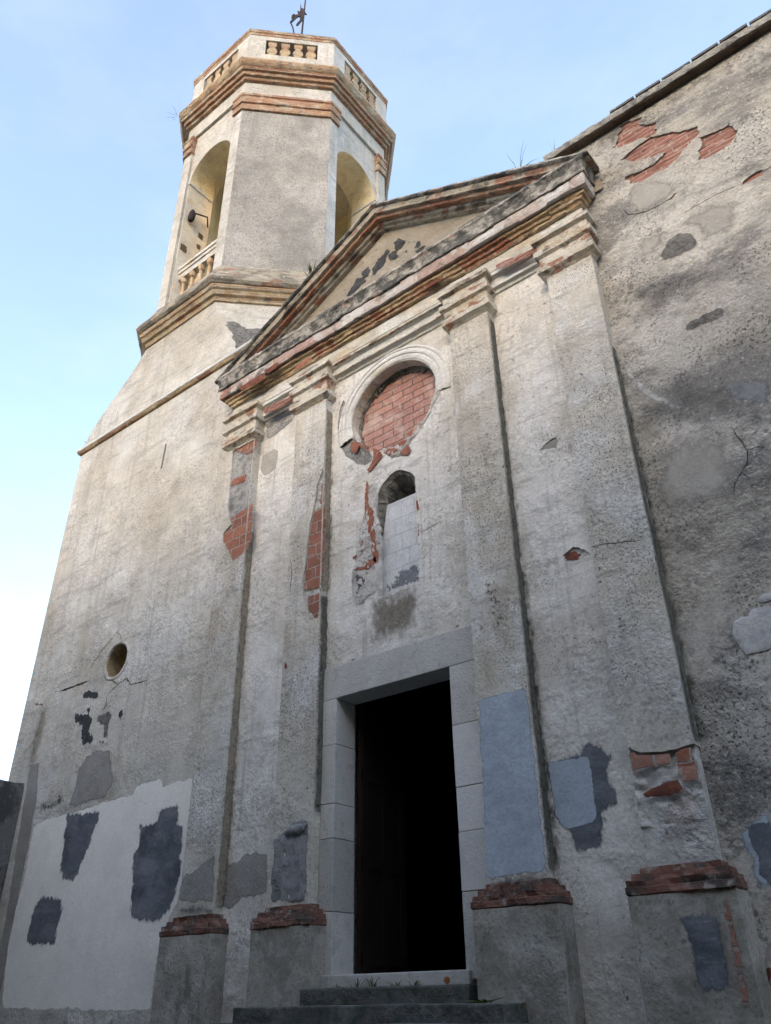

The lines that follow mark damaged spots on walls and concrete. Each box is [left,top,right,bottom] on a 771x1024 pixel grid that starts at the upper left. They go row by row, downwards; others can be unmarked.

flaking render [613,119,737,183]
flaking render [347,239,426,297]
flaking render [223,397,294,561]
flaking render [341,366,441,605]
crack [732,427,760,496]
flaking render [303,474,326,619]
flaking render [564,548,590,562]
leakage [373,565,419,635]
crack [103,678,149,710]
spalling [629,745,723,867]